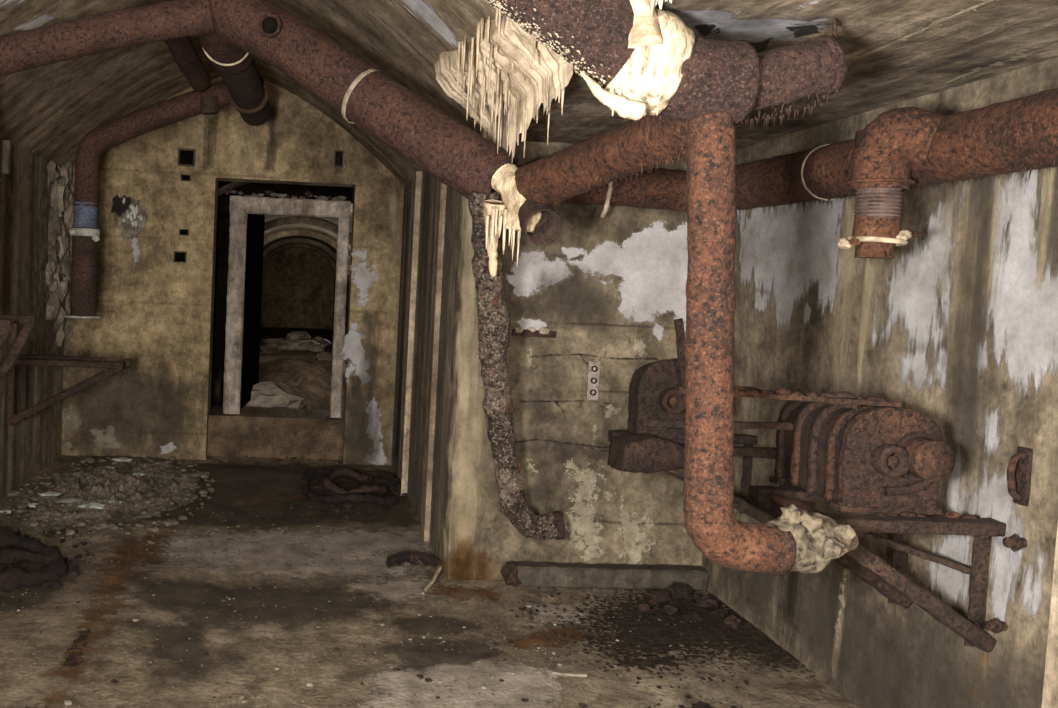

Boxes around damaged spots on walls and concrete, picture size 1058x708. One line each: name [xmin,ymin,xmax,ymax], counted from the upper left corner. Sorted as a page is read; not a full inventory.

spalling [111,195,148,267]
peeling [350,239,380,307]
peeling [506,220,688,358]
peeling [737,197,850,330]
peeling [872,169,1058,396]
peeling [340,322,370,385]
peeling [365,397,388,465]
peeling [975,406,1000,453]
peeling [929,535,971,610]
peeling [939,453,1044,633]